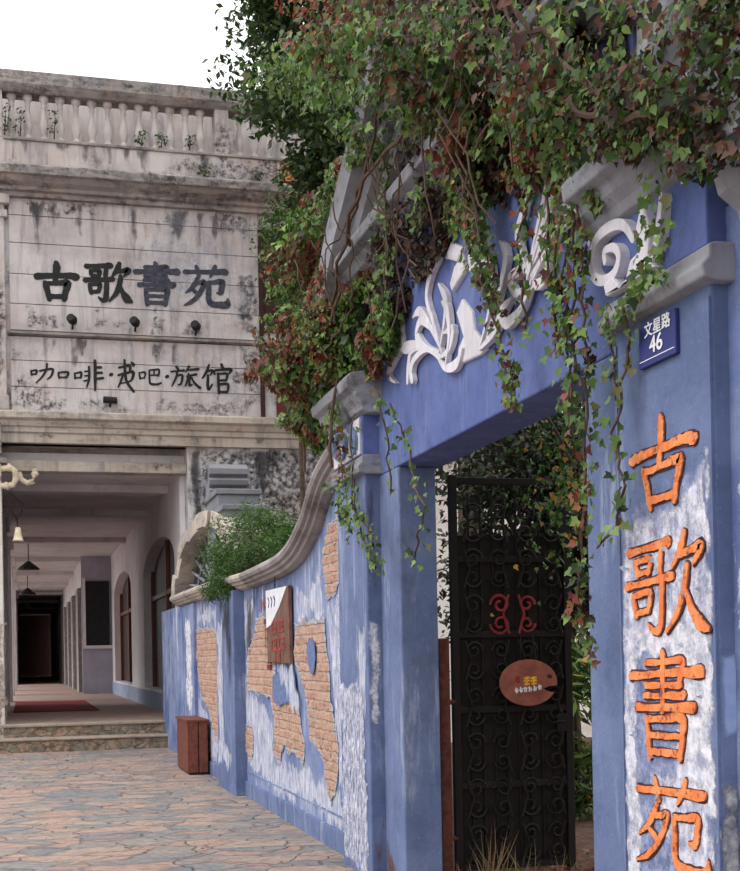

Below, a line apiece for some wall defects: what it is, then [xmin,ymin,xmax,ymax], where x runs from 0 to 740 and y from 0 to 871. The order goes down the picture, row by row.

water stain [30,202,55,225]
water stain [167,212,186,238]
water stain [212,213,246,235]
water stain [239,277,259,339]
water stain [191,449,317,521]
flaking render [0,621,9,735]
flaking render [185,603,232,771]
flaking render [244,516,380,871]
peeling [620,449,740,871]